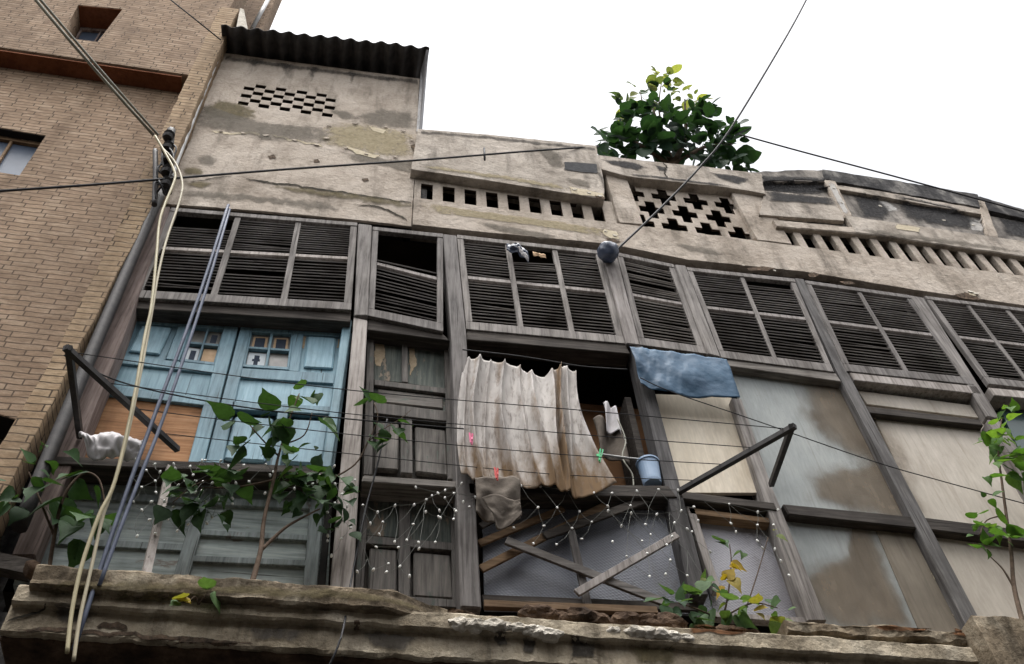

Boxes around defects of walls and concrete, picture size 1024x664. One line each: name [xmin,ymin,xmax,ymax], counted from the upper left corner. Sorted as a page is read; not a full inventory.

water stain [197,107,325,140]
water stain [333,110,413,127]
peeling [213,123,415,158]
water stain [352,154,412,172]
water stain [811,386,902,516]